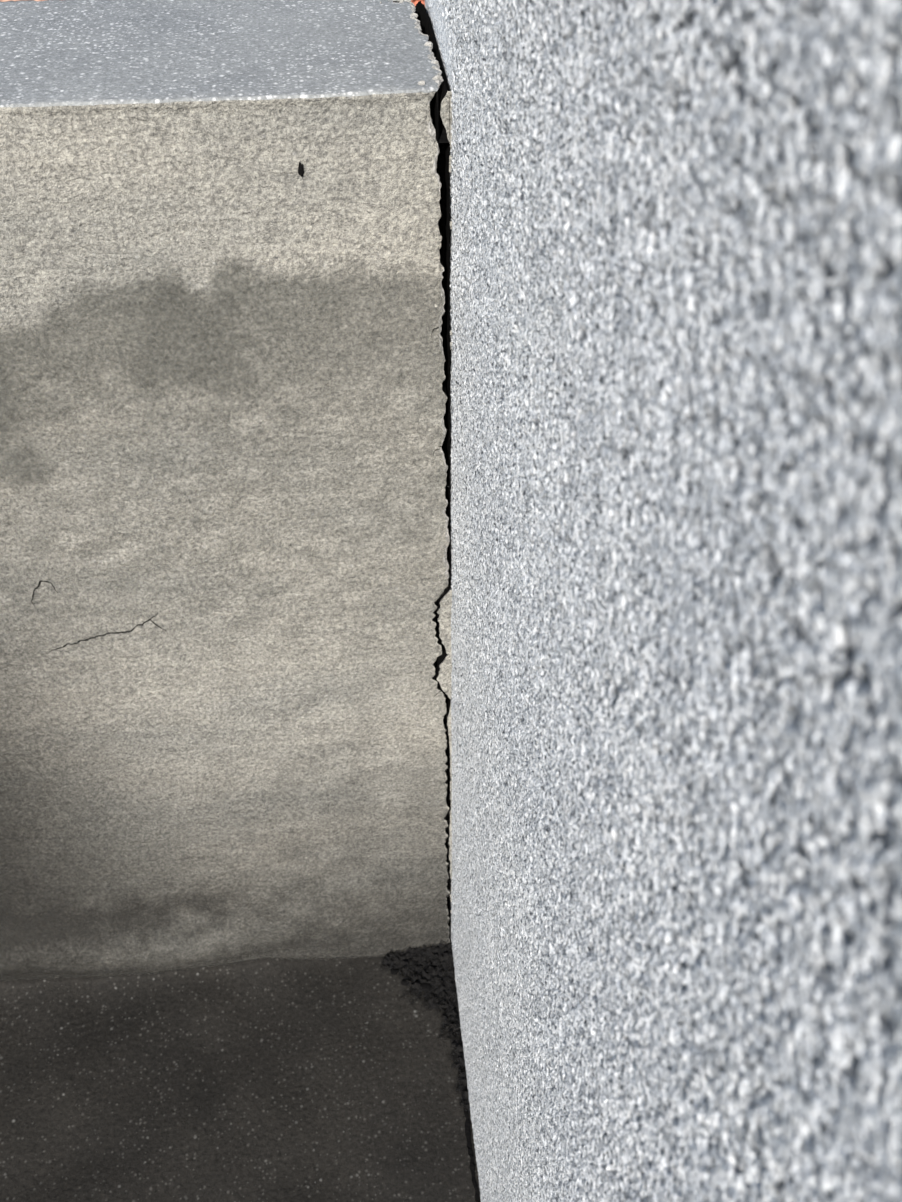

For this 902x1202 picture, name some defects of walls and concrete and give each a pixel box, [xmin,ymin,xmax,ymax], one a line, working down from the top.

damp [0,260,425,443]
crack [404,0,451,939]